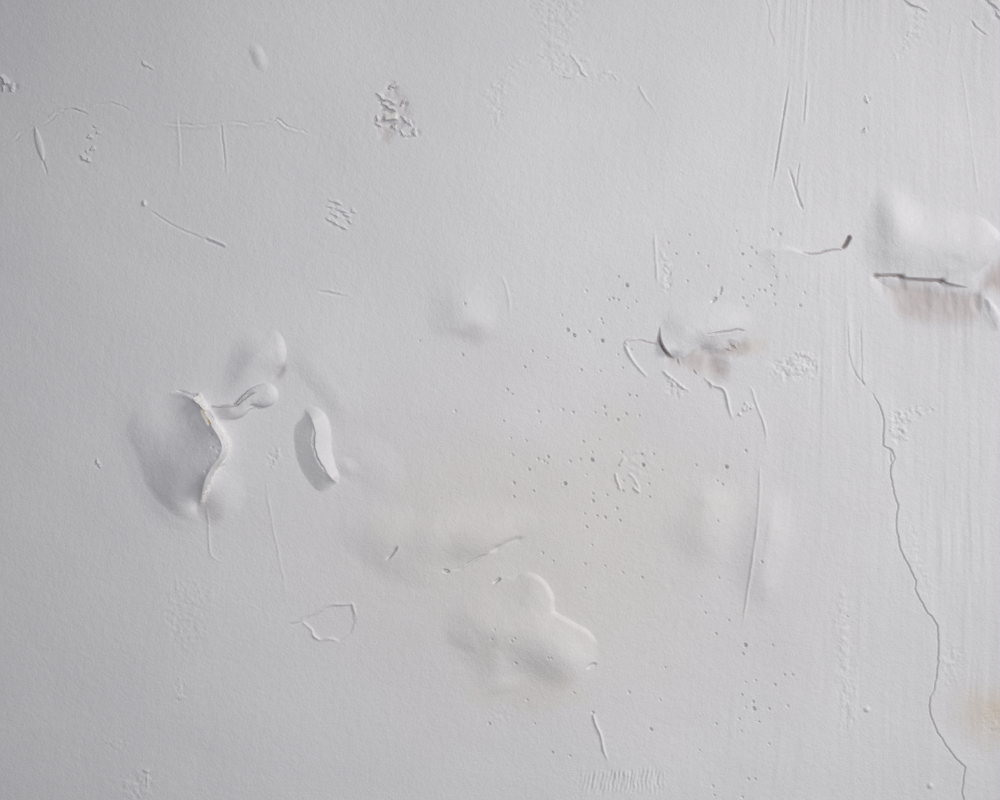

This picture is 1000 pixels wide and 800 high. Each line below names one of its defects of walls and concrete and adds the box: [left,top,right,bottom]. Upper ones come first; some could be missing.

crack [0,101,314,180]
peeling [376,81,416,143]
crack [794,232,852,256]
crack [846,316,968,800]